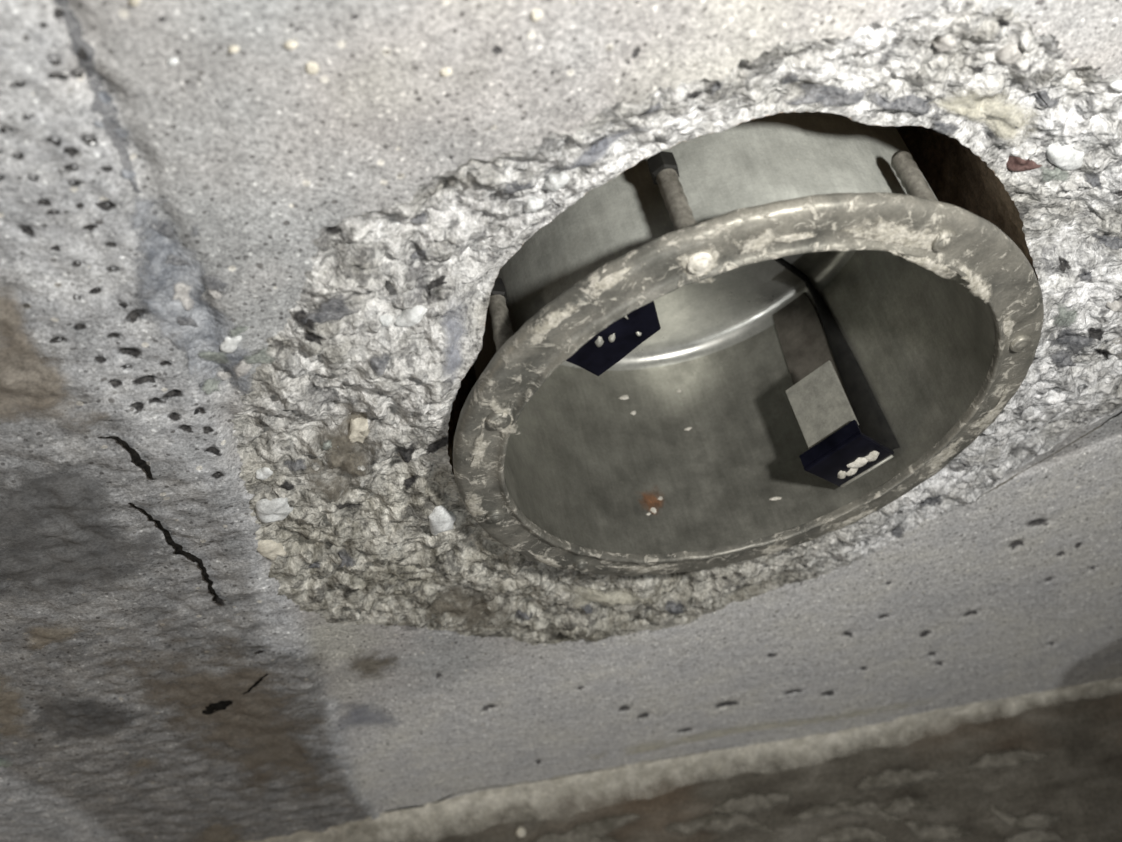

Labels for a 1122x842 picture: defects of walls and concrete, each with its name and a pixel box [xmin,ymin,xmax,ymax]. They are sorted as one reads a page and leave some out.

spalling [108,333,171,388]
spalling [119,0,1122,646]
crack [100,436,155,480]
crack [979,412,1122,498]
crack [129,503,225,606]